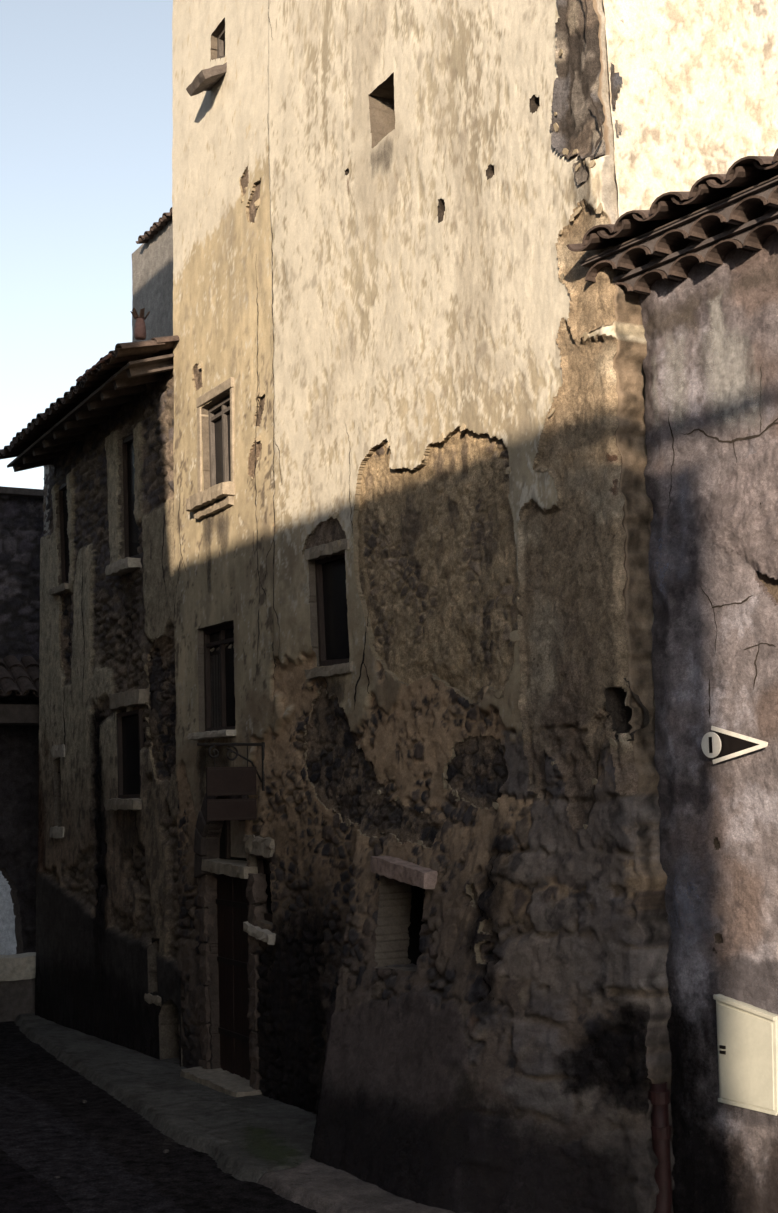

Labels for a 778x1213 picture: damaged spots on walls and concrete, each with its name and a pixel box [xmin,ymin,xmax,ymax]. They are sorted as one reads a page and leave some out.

spalling [531,0,623,185]
spalling [241,168,261,223]
spalling [248,389,265,480]
crack [668,362,778,507]
spalling [60,591,73,682]
spalling [147,636,176,781]
spalling [303,199,639,848]
spalling [758,571,778,602]
water stain [256,904,627,1213]